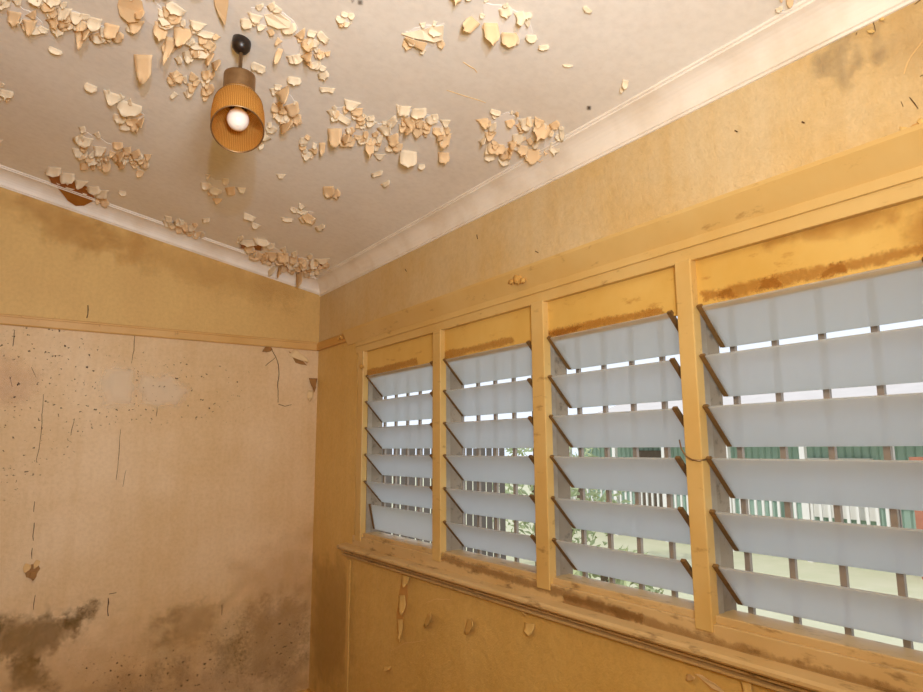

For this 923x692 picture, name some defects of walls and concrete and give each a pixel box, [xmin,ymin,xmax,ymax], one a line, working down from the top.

peeling [0,0,221,102]
peeling [240,2,335,93]
peeling [336,11,355,28]
peeling [402,21,445,55]
peeling [462,0,550,51]
peeling [45,126,152,208]
peeling [84,83,144,134]
peeling [258,76,302,150]
peeling [299,99,452,187]
peeling [475,109,564,166]
peeling [162,215,210,239]
peeling [236,212,330,286]